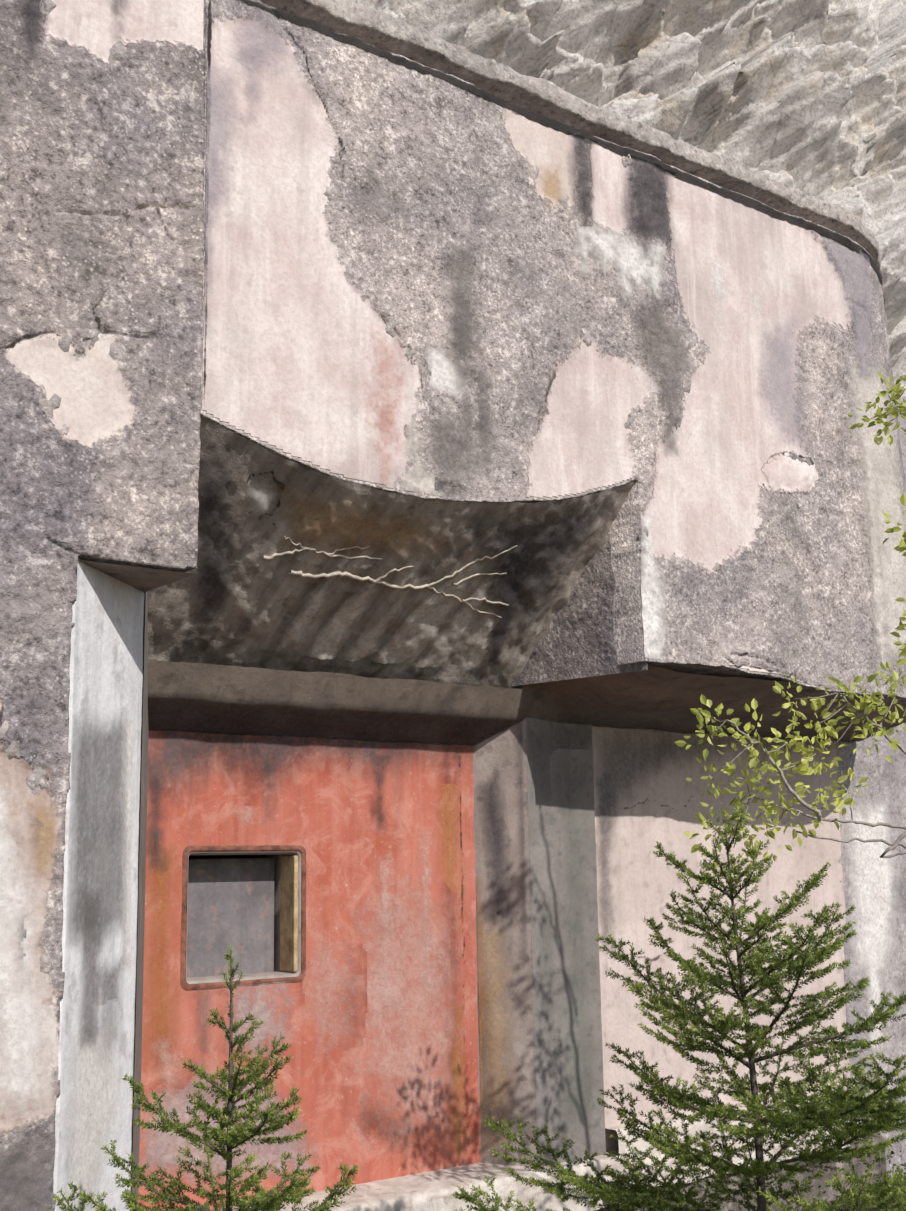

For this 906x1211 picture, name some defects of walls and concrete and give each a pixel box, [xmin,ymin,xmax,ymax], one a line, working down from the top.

flaking render [4,328,137,451]
flaking render [38,0,463,488]
flaking render [501,108,636,235]
leakage [575,139,671,297]
flaking render [525,171,853,578]
flaking render [0,698,63,1132]
leakage [67,701,511,1207]